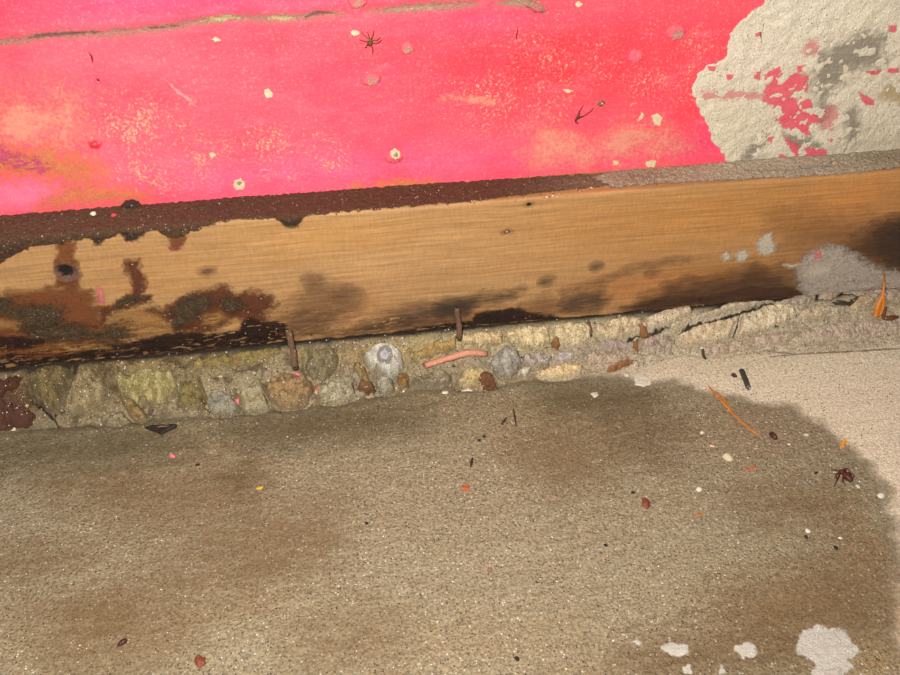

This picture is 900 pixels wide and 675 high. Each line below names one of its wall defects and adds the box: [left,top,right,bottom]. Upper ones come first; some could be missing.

crack [0,0,546,46]
peeling [676,0,900,162]
water stain [845,220,900,272]
water stain [624,262,837,311]
water stain [0,318,288,368]
water stain [363,295,559,332]
crack [627,304,769,342]
water stain [0,377,900,675]